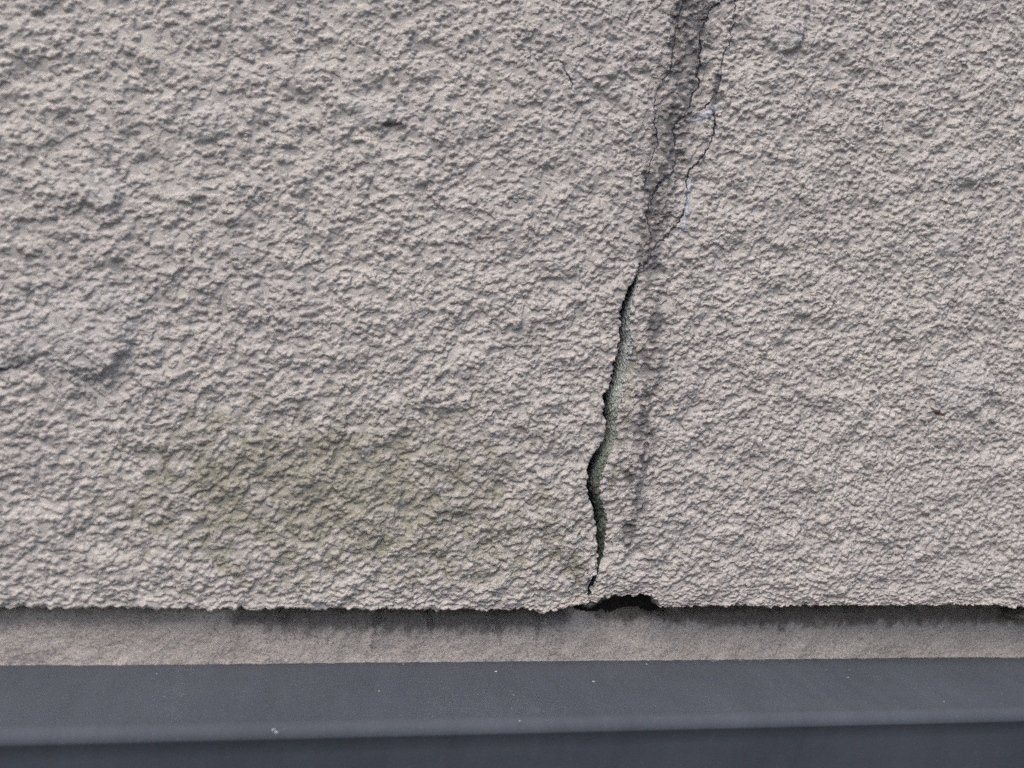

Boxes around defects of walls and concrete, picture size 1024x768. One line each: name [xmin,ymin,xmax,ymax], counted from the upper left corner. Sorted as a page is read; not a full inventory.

crack [580,0,736,609]